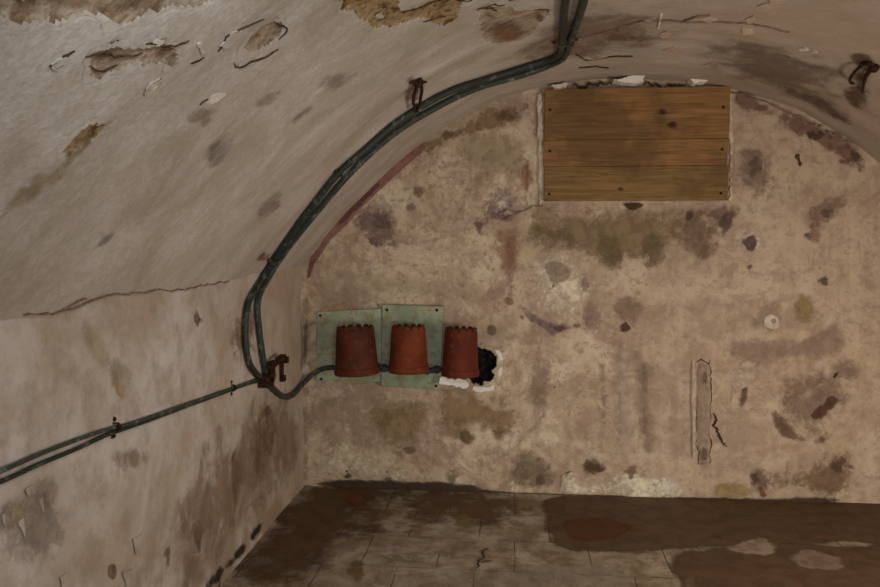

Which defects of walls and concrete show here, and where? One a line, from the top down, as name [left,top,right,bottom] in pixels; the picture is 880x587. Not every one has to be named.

flaking render [0,0,214,97]
flaking render [334,0,551,45]
crack [23,281,230,316]
leakage [184,361,880,587]